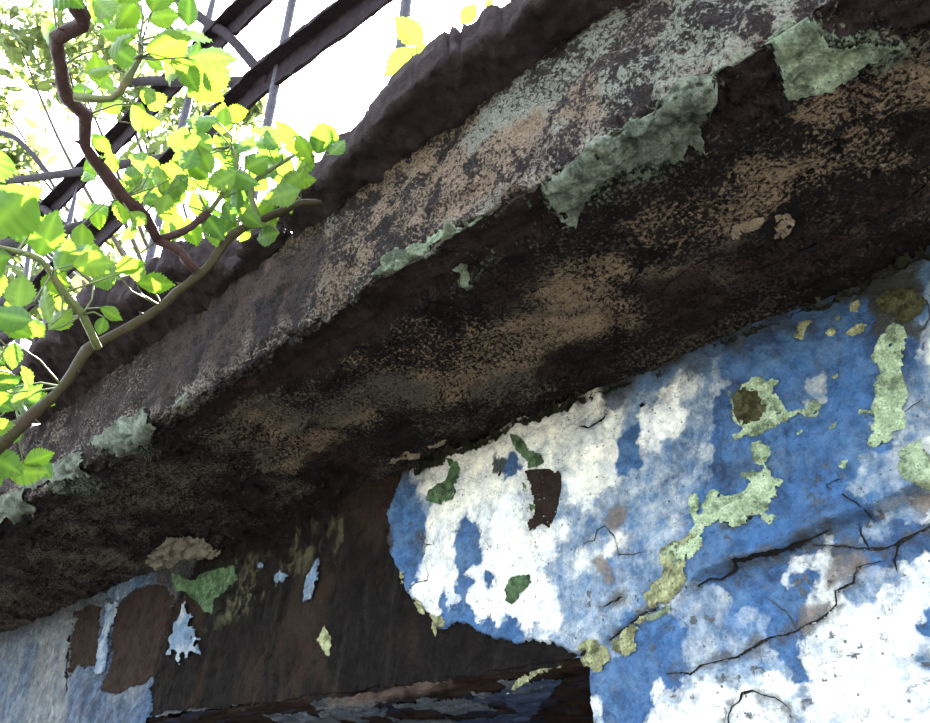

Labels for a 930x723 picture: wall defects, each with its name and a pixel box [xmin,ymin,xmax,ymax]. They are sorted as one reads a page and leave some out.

peeling [774,213,795,239]
crack [568,409,614,430]
crack [585,525,642,555]
spalling [66,604,102,676]
water stain [98,574,156,602]
spalling [100,468,586,723]
crack [587,591,715,655]
crack [665,477,930,723]